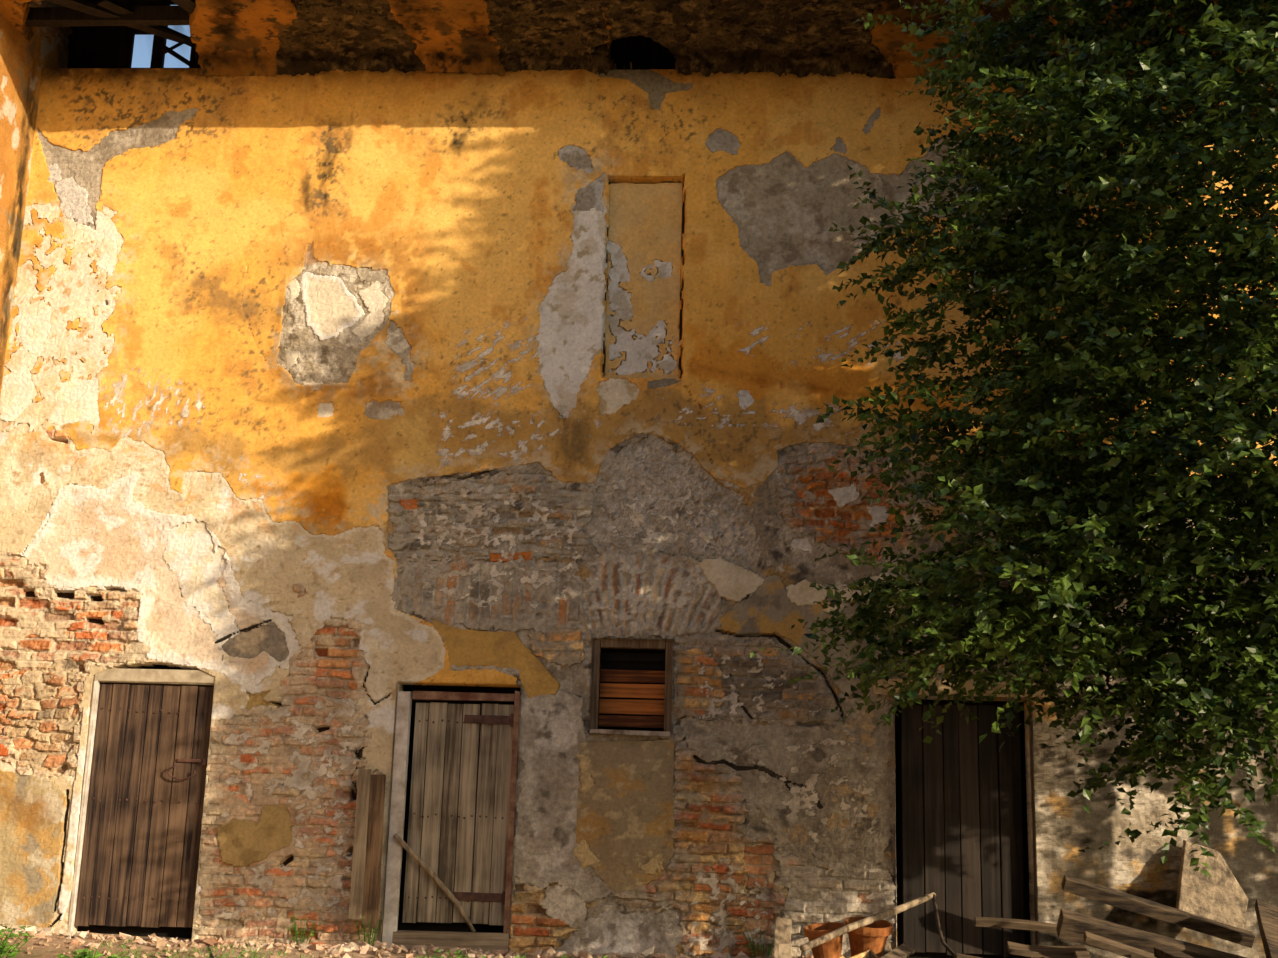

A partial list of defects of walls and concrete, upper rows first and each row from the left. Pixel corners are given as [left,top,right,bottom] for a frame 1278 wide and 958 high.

flaking render [0,0,1012,958]
crack [215,619,272,644]
crack [716,630,843,719]
flaking render [928,622,1211,958]
flaking render [1197,735,1278,881]
flaking render [1105,904,1266,958]